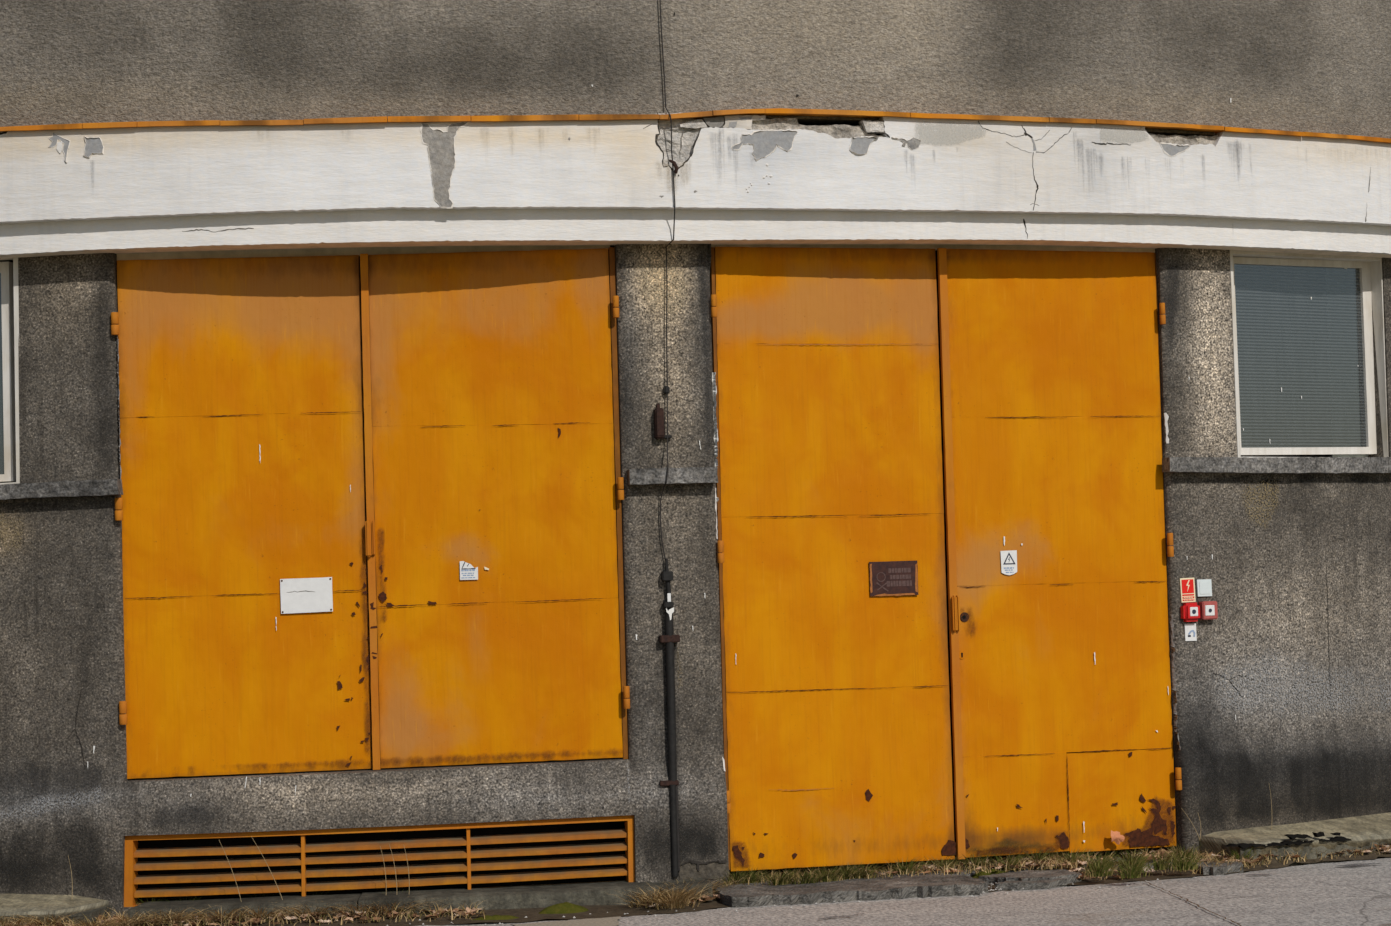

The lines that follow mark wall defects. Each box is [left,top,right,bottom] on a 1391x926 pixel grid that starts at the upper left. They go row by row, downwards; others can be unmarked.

peeling [49,132,104,163]
peeling [420,122,469,209]
spalling [655,112,983,176]
crack [978,121,1072,238]
flaking render [1093,129,1219,157]
corrosion [349,531,437,682]
corrosion [309,676,371,766]
corrosion [732,832,769,867]
corrosion [941,837,970,856]
corrosion [1045,815,1069,849]
corrosion [1124,793,1176,847]